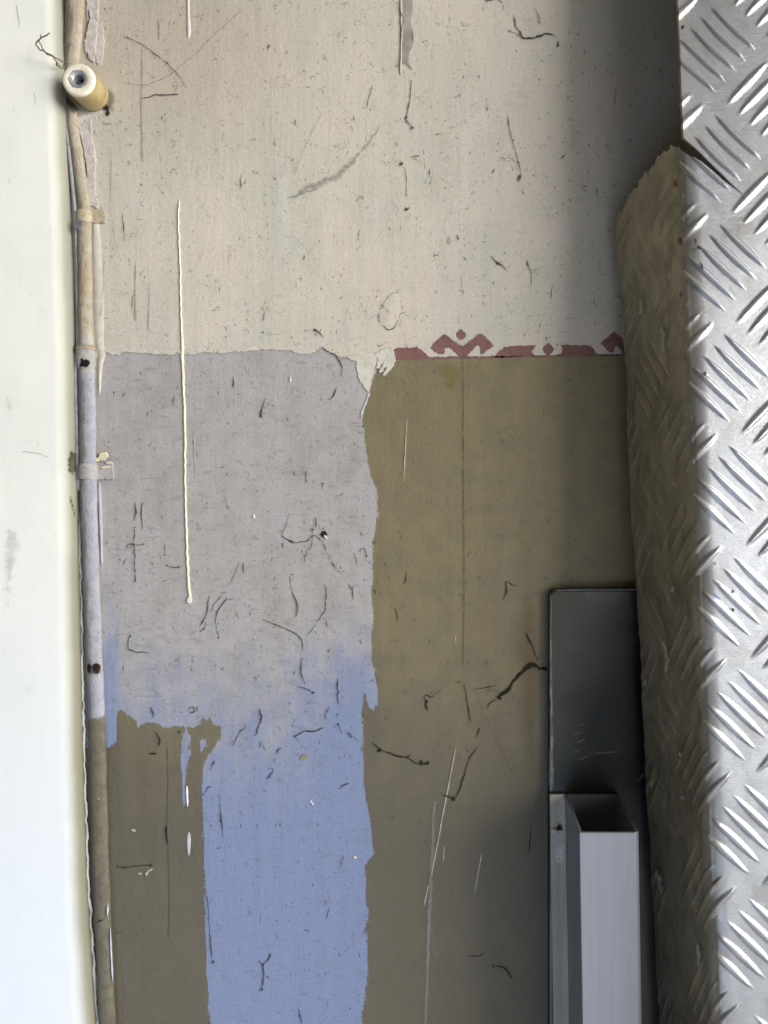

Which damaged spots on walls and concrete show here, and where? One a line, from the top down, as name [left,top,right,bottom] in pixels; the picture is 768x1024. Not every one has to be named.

peeling [84,0,105,65]
peeling [77,115,99,209]
peeling [103,346,315,355]
peeling [346,348,396,418]
crack [459,373,467,527]
crack [233,515,429,779]
crack [424,633,548,801]